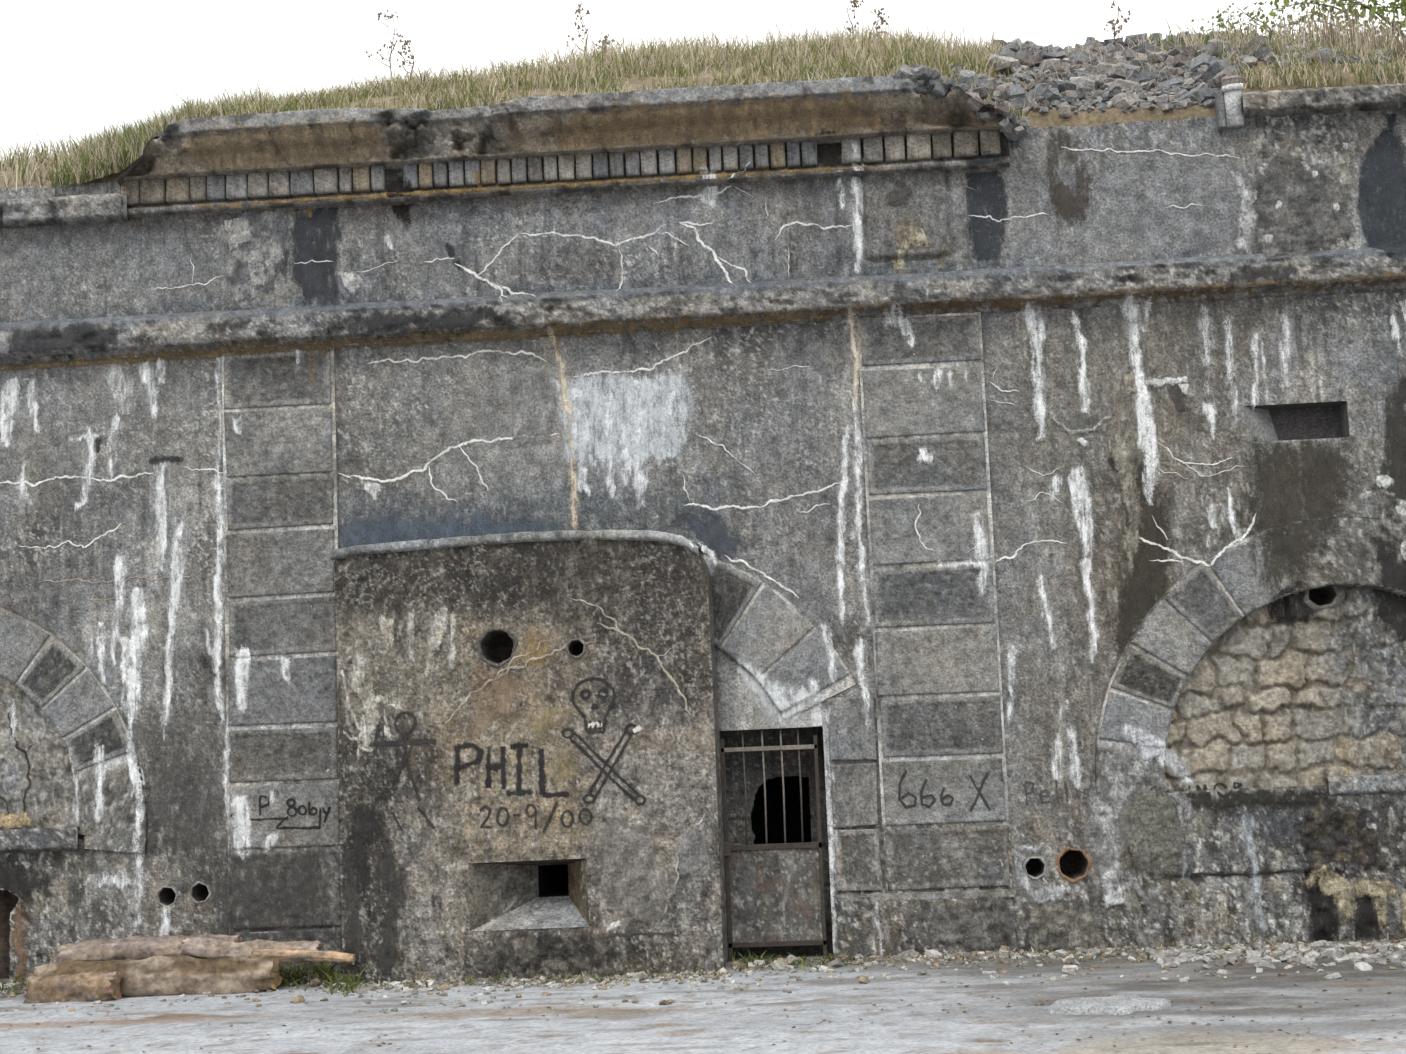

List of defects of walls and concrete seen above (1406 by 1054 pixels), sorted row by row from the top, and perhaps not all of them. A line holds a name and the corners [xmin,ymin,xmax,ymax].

crack [294,162,853,302]
leakage [1022,302,1046,440]
crack [338,433,558,502]
leakage [338,327,693,548]
leakage [1050,272,1177,663]
leakage [1381,374,1406,501]
crack [724,555,799,598]
crack [1138,514,1256,567]
leakage [86,357,406,976]
crack [445,598,692,724]
crack [0,713,36,823]
leakage [69,744,109,825]